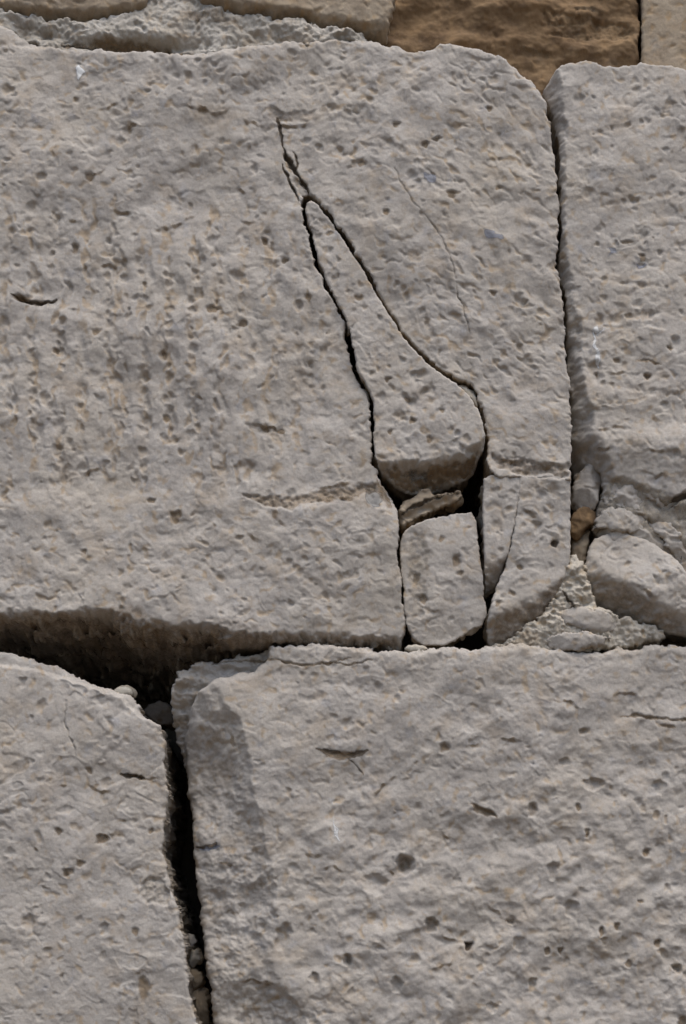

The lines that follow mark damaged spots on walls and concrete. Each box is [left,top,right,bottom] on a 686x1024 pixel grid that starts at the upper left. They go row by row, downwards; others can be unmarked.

crack [276,117,309,201]
spalling [570,464,686,564]